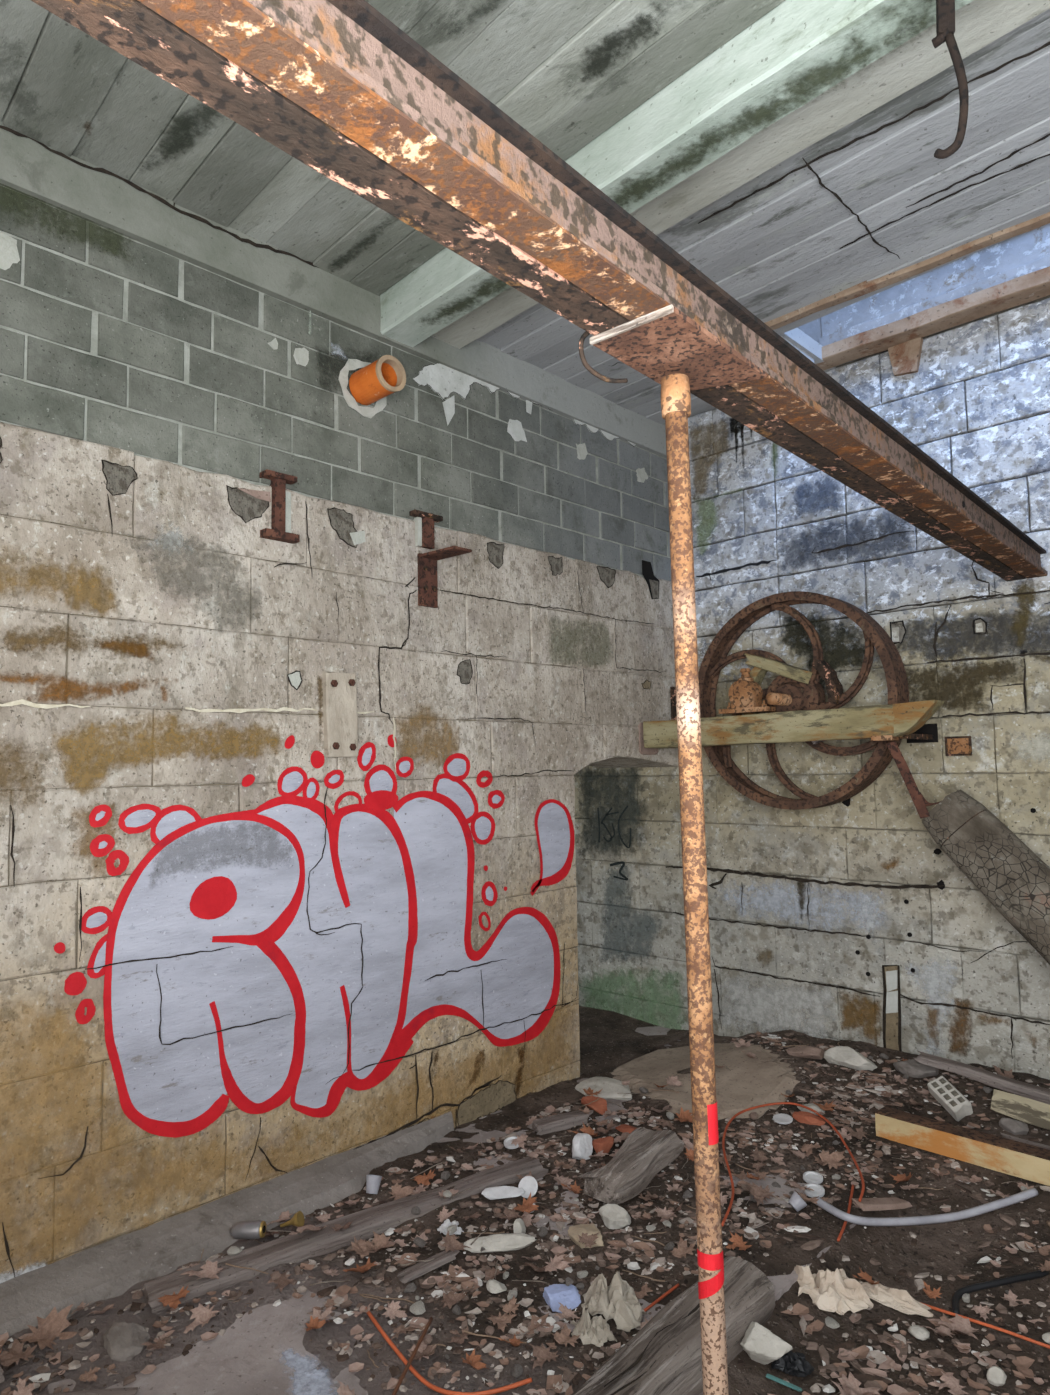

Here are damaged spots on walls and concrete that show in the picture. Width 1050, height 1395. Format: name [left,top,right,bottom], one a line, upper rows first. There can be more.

damp [582,3,663,81]
damp [614,0,935,206]
crack [698,41,1050,259]
crack [0,125,332,274]
damp [423,276,507,322]
peeling [375,355,551,425]
peeling [573,419,636,447]
spalling [101,459,138,496]
spalling [226,485,271,523]
damp [4,626,173,656]
crack [378,568,661,777]
crack [306,787,579,1150]